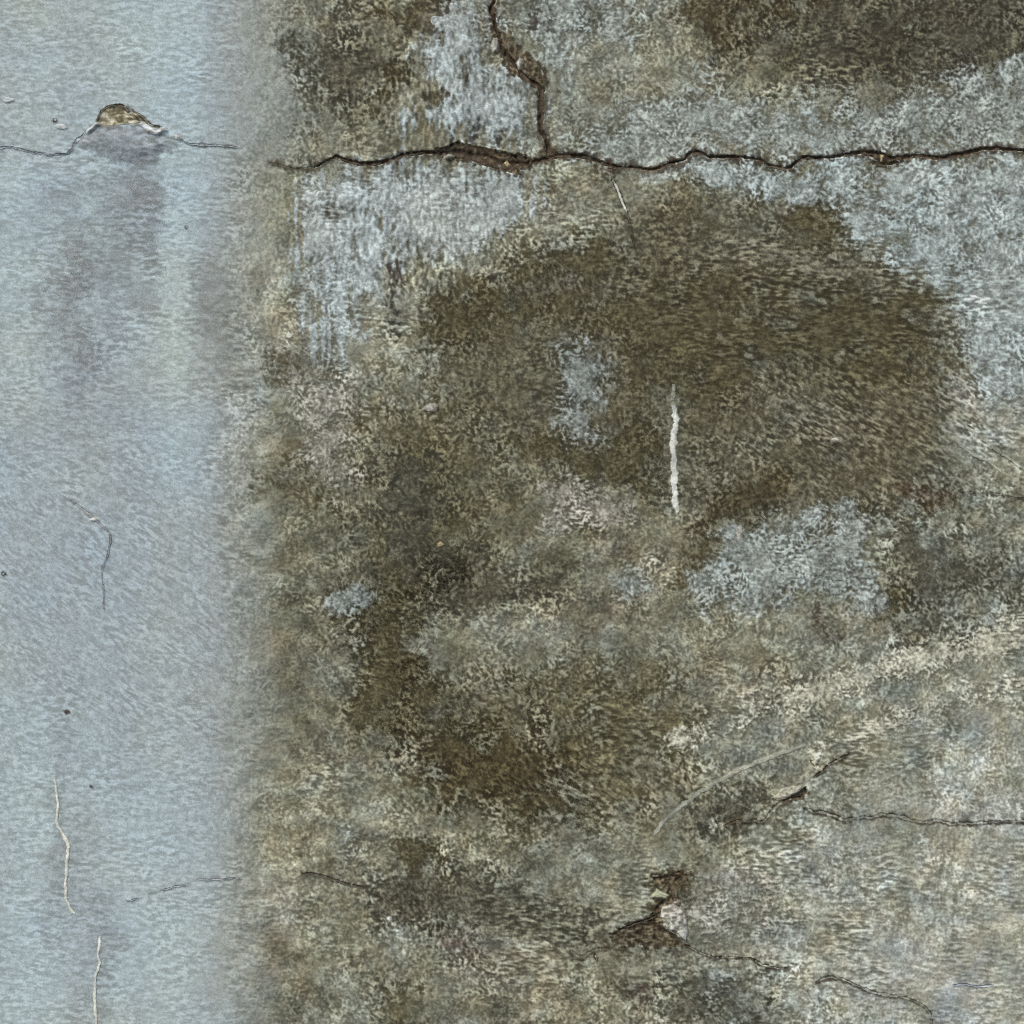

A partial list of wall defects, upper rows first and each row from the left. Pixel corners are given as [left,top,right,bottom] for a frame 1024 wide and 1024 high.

crack [0,133,85,155]
spalling [85,103,183,139]
crack [172,136,237,147]
crack [267,0,1024,257]
water stain [331,170,1022,841]
crack [68,498,111,610]
crack [724,752,1024,826]
crack [627,913,660,927]
spalling [609,863,699,948]
crack [684,944,789,970]
crack [815,974,933,1024]